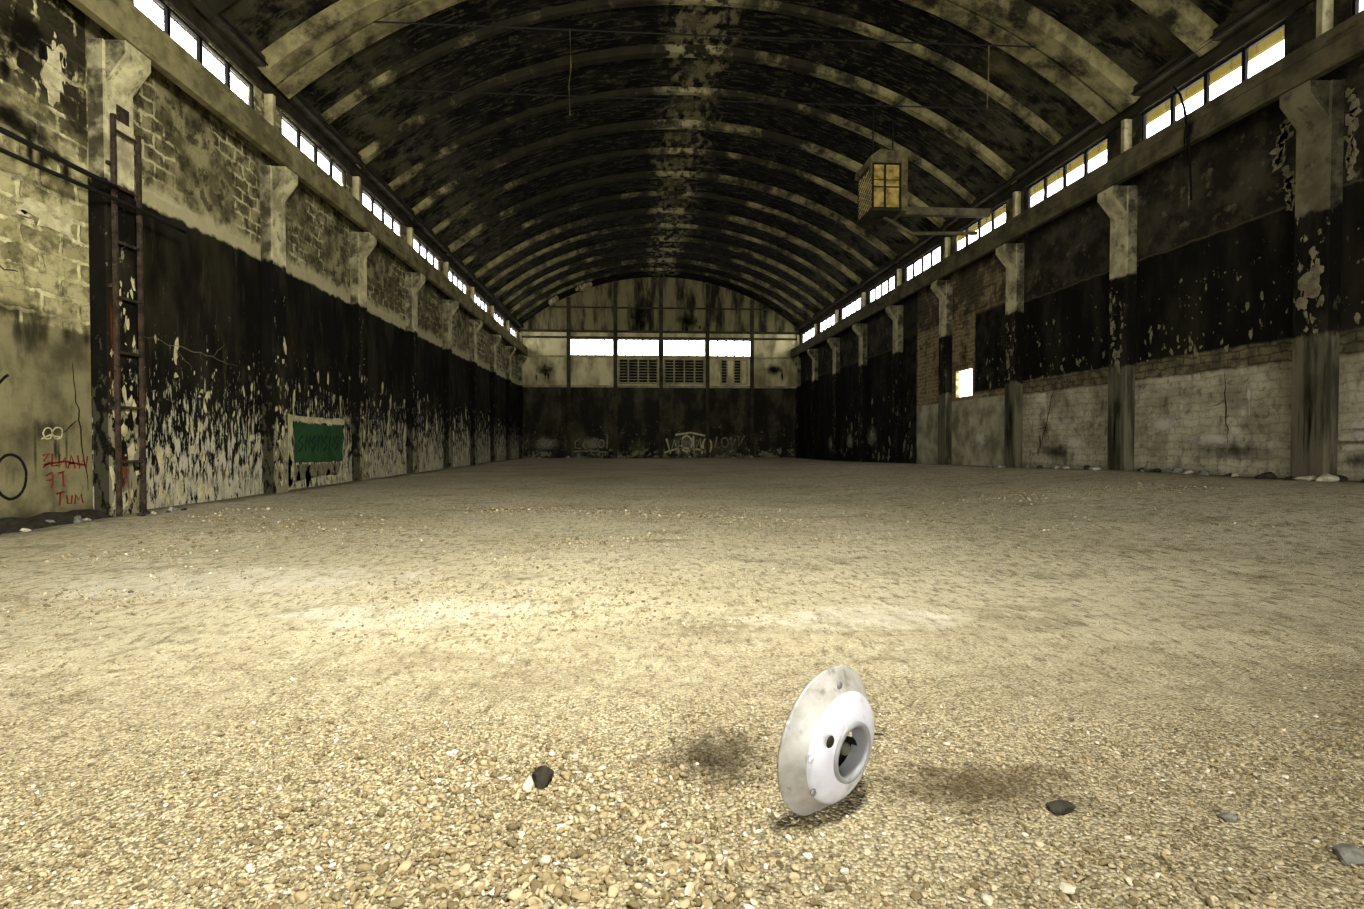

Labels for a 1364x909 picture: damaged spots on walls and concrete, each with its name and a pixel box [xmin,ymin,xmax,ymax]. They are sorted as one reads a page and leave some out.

spalling [40,32,67,107]
spalling [1344,87,1362,181]
spalling [15,197,83,238]